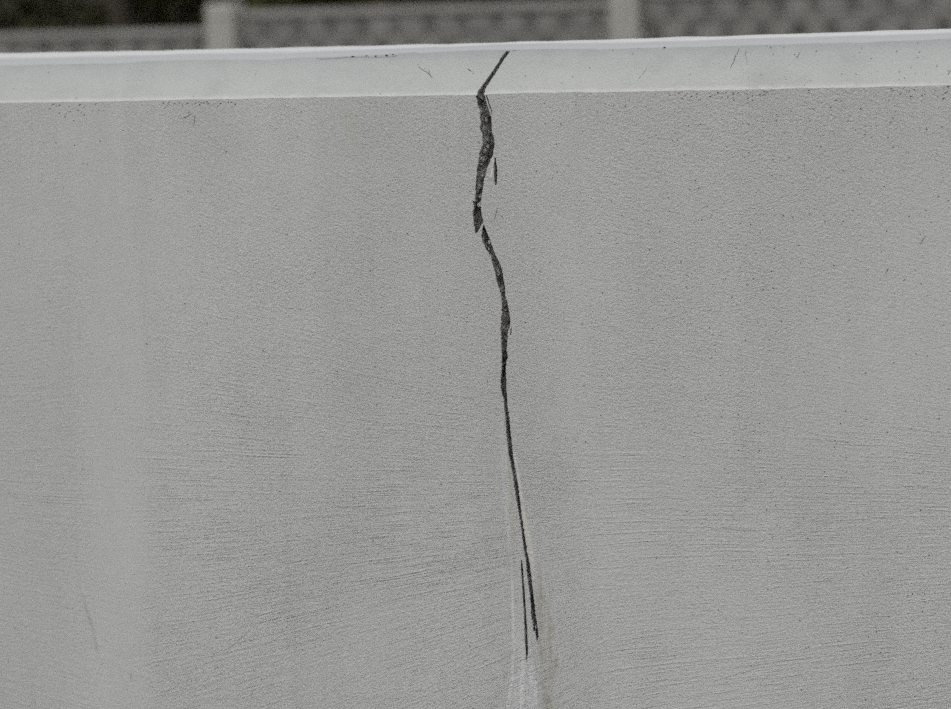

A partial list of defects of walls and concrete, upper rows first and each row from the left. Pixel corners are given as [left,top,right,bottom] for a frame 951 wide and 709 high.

crack [472,50,539,662]
damp [499,413,564,709]